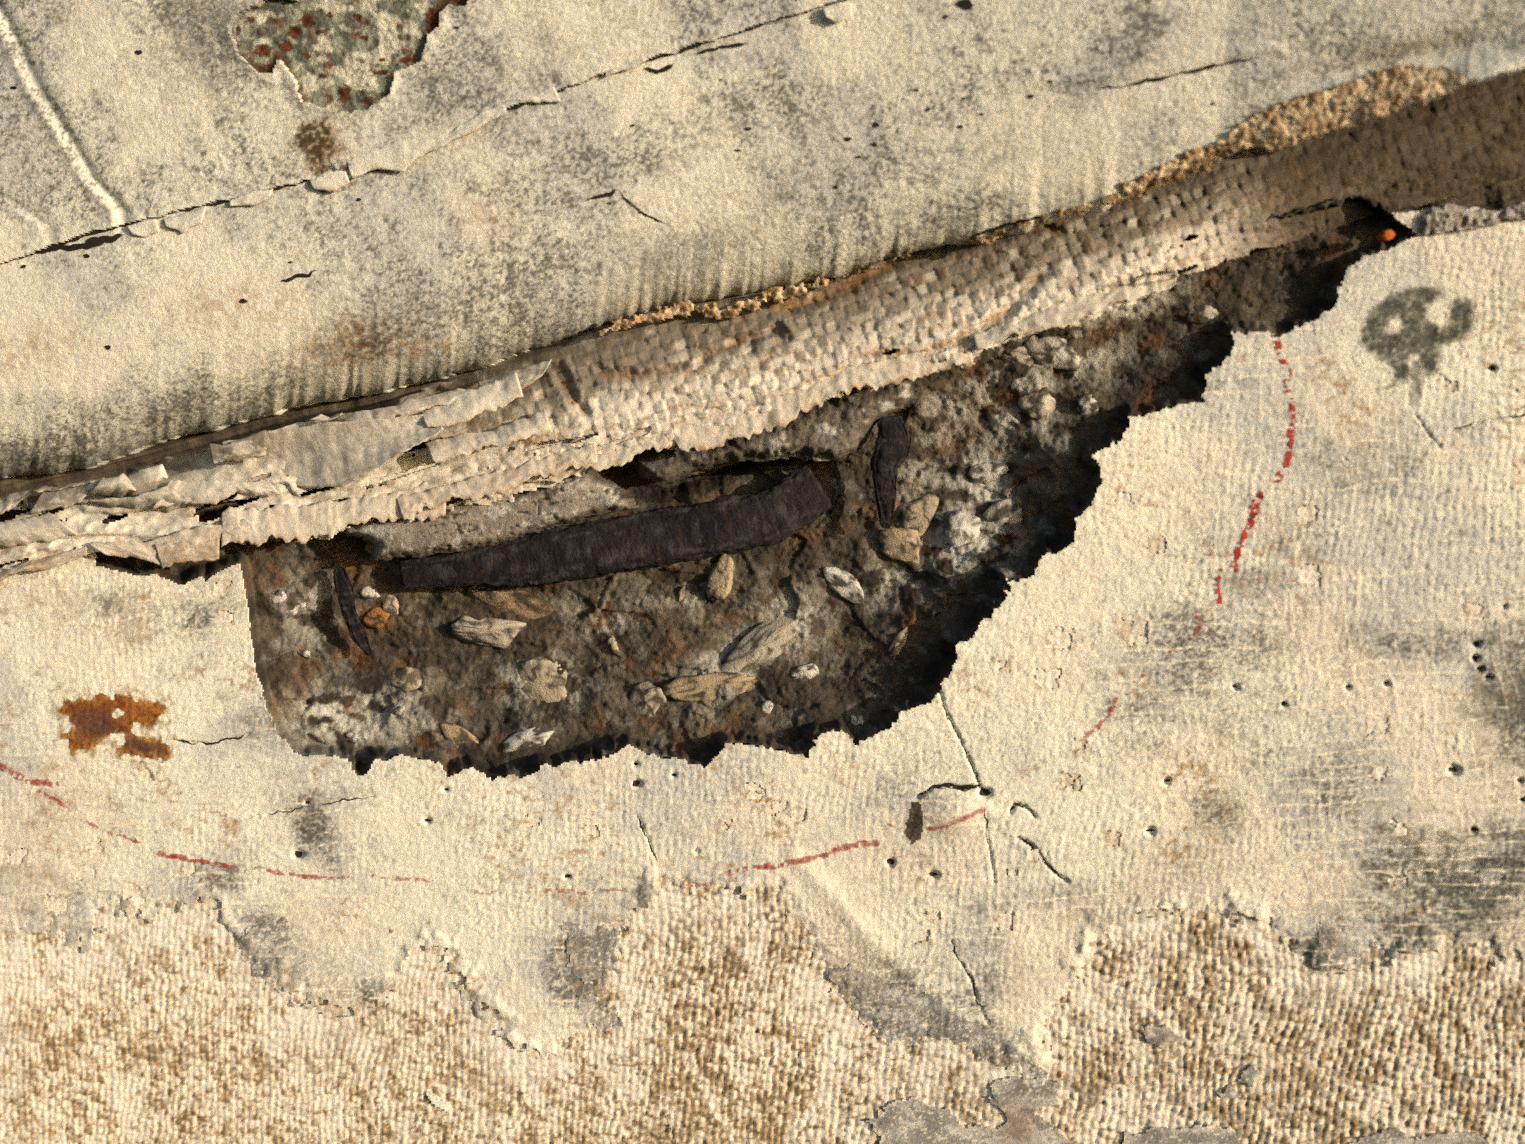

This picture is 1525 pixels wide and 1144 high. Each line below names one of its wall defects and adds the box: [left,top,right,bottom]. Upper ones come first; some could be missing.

crack [5,0,852,263]
crack [280,270,316,282]
spalling [96,193,1525,791]
corrosion [57,693,172,781]
crack [918,697,1067,883]
peeling [183,861,196,875]
peeling [1005,849,1043,877]
peeling [0,870,1525,1144]
crack [951,939,987,1022]